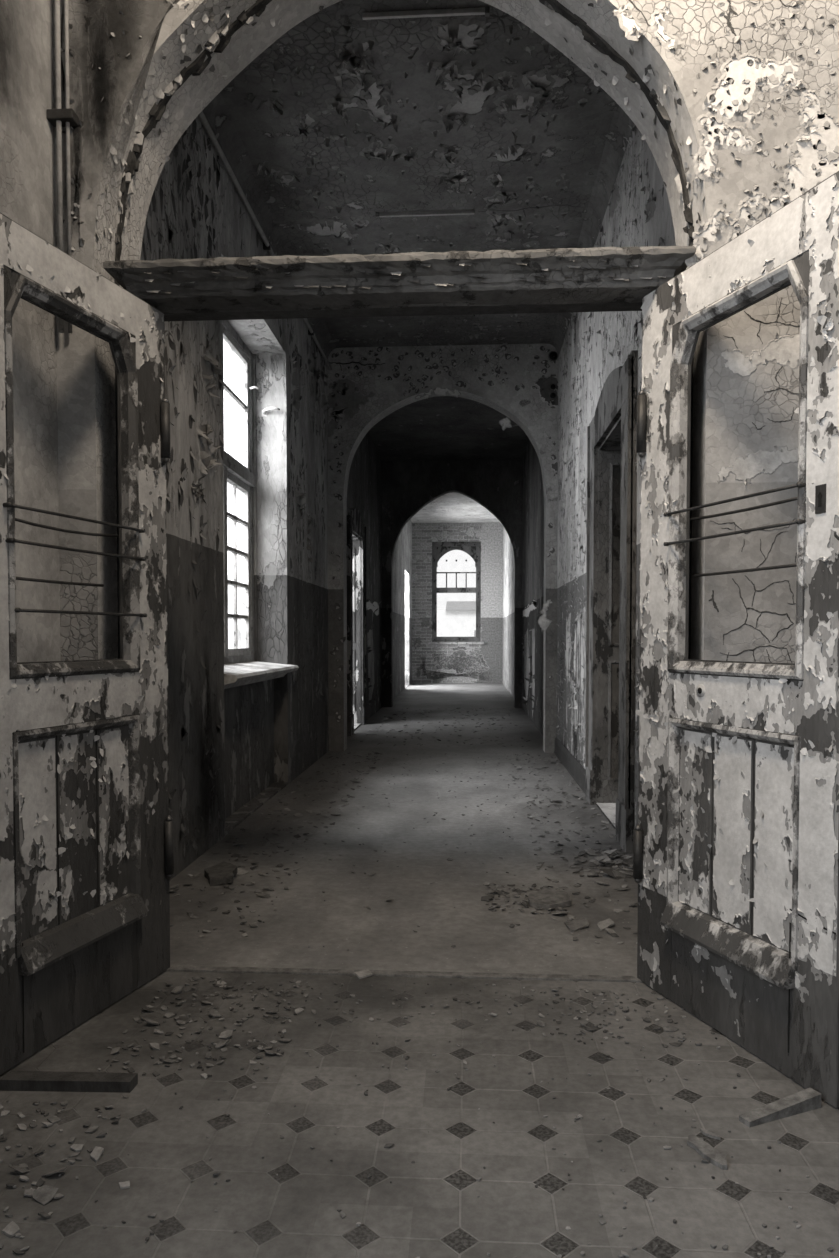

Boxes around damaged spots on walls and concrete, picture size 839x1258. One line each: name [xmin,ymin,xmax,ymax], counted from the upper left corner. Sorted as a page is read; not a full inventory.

water stain [66,0,129,210]
peeling [100,0,242,217]
peeling [290,51,417,162]
peeling [431,19,556,131]
peeling [610,5,682,140]
crack [629,0,667,42]
peeling [674,52,839,267]
crack [724,0,796,36]
peeling [720,332,800,378]
crack [725,299,800,430]
crack [709,518,797,663]
peeling [82,723,106,782]